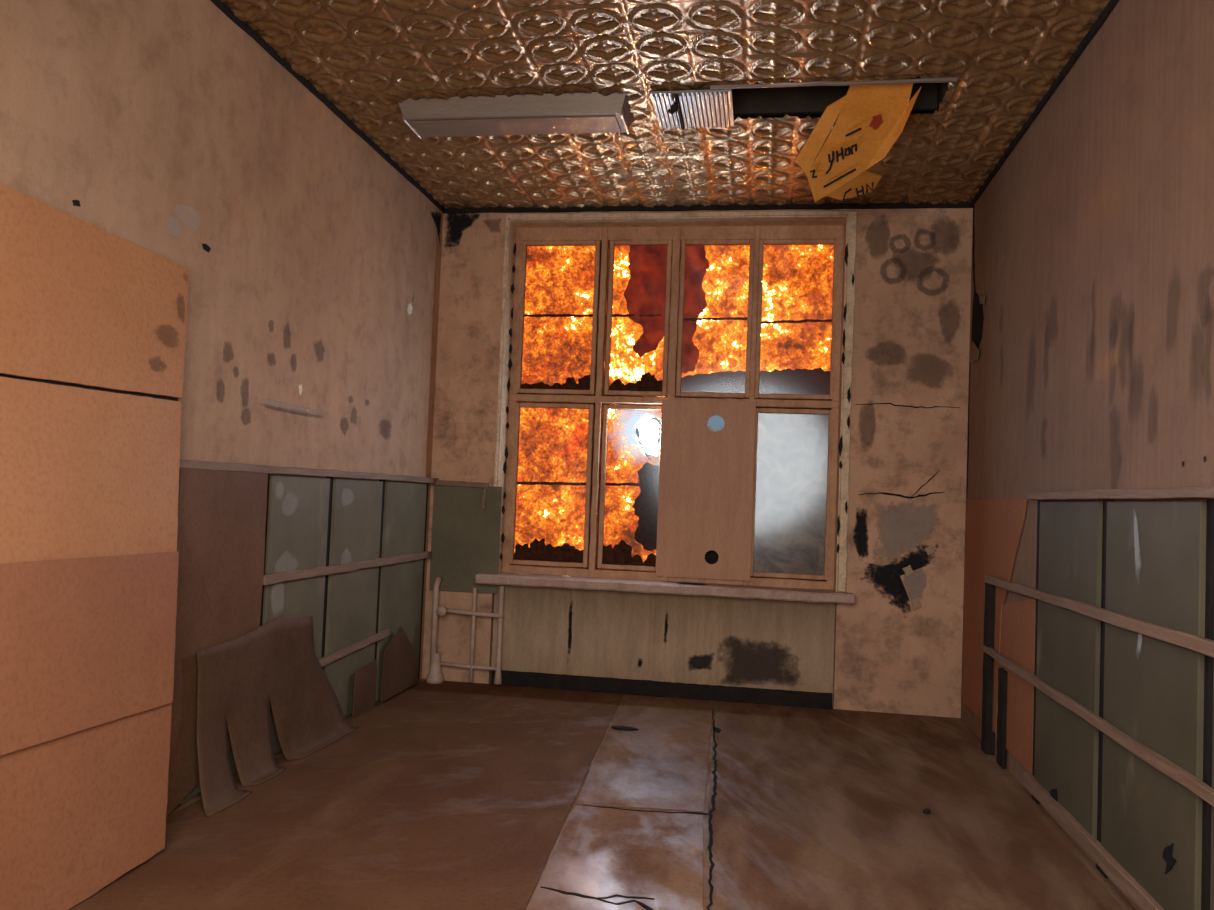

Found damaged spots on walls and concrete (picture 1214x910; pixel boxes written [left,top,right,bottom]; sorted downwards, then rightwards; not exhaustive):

crack [541,886,654,910]
crack [584,710,721,910]